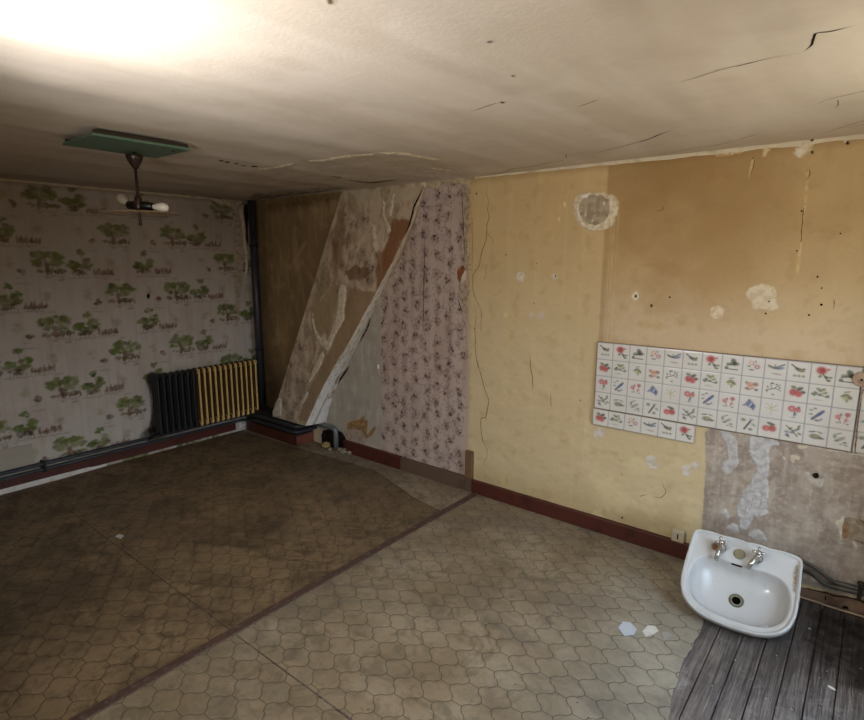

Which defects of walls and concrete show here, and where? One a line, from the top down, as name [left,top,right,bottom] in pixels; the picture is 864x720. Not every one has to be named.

crack [685,25,856,81]
crack [472,156,567,476]
peeling [744,282,781,312]
spalling [835,515,864,550]